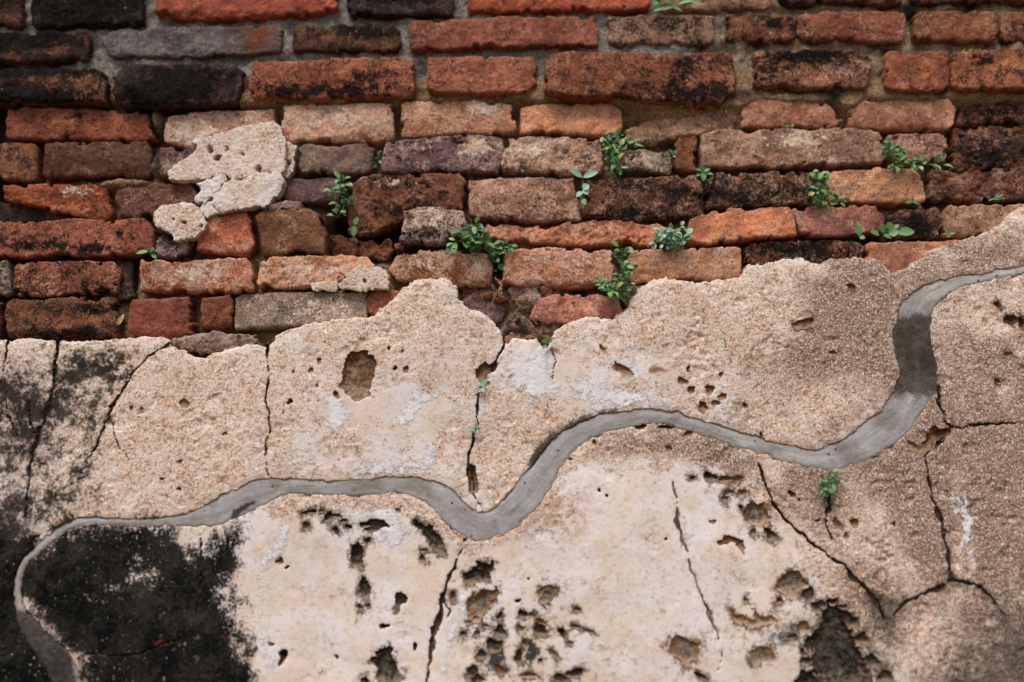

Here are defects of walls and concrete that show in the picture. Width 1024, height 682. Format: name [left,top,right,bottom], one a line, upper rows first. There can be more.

peeling [153,121,299,244]
crack [3,339,60,517]
crack [84,342,170,463]
leakage [0,269,293,682]
leakage [276,292,364,326]
peeling [311,265,390,293]
crack [425,524,466,682]
crack [466,340,505,506]
crack [672,482,722,670]
flaking render [791,317,814,331]
crack [758,385,1016,626]
flaking render [991,298,1024,330]